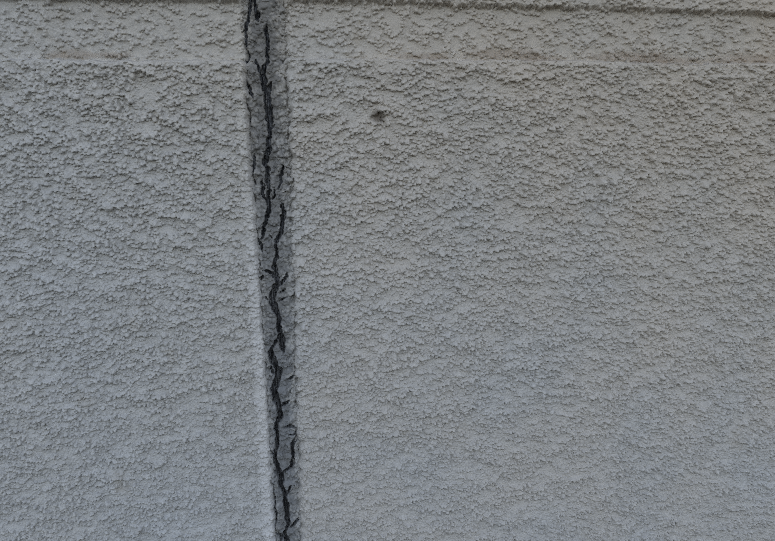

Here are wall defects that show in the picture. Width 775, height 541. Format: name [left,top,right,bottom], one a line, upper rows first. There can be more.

crack [243,0,299,541]